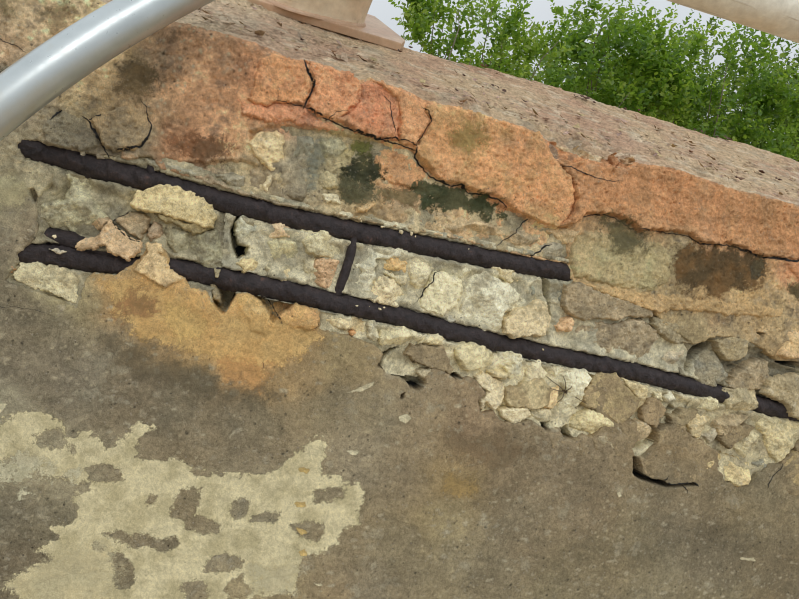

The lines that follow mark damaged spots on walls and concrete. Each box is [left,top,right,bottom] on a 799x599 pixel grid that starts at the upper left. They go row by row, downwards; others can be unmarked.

crack [82,98,152,157]
corrosion [18,140,571,281]
corrosion [18,227,730,403]
crack [278,59,507,210]
spalling [7,126,799,496]
leakage [335,138,508,223]
peeling [191,2,799,195]
crack [583,214,799,262]
leakage [668,237,770,304]
corrosion [753,395,799,422]
peeling [0,403,365,599]